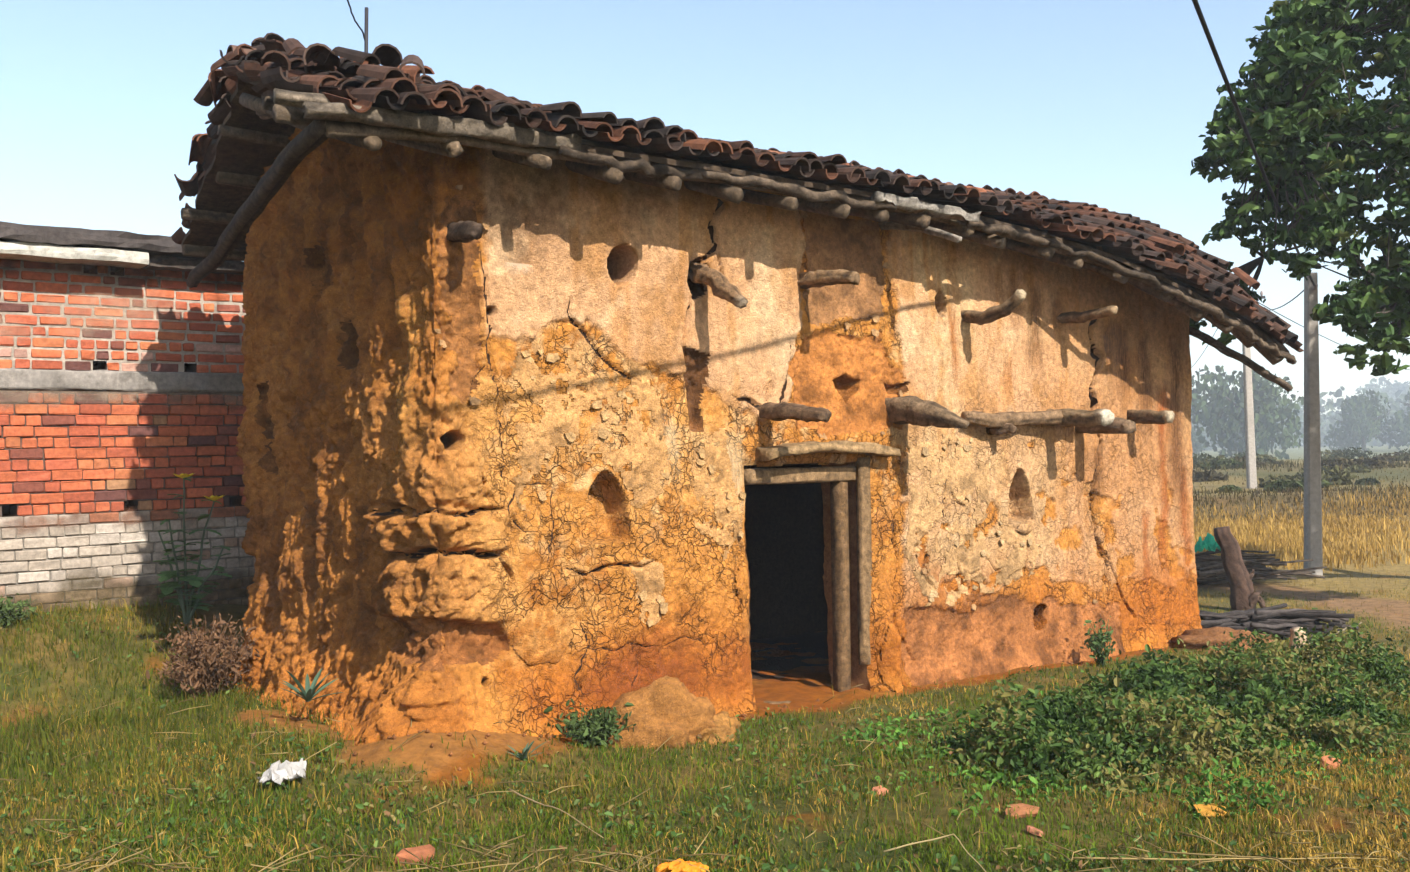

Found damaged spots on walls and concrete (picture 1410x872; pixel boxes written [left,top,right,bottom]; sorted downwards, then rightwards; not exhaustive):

spalling [433,185,498,405]
spalling [607,243,638,286]
spalling [687,255,710,299]
crack [702,198,724,260]
crack [1088,319,1100,408]
spalling [440,430,466,450]
crack [370,253,702,695]
flaking render [503,345,673,510]
flaking render [682,346,746,561]
spalling [788,211,1125,686]
flaking render [629,557,668,627]
spalling [383,613,510,690]